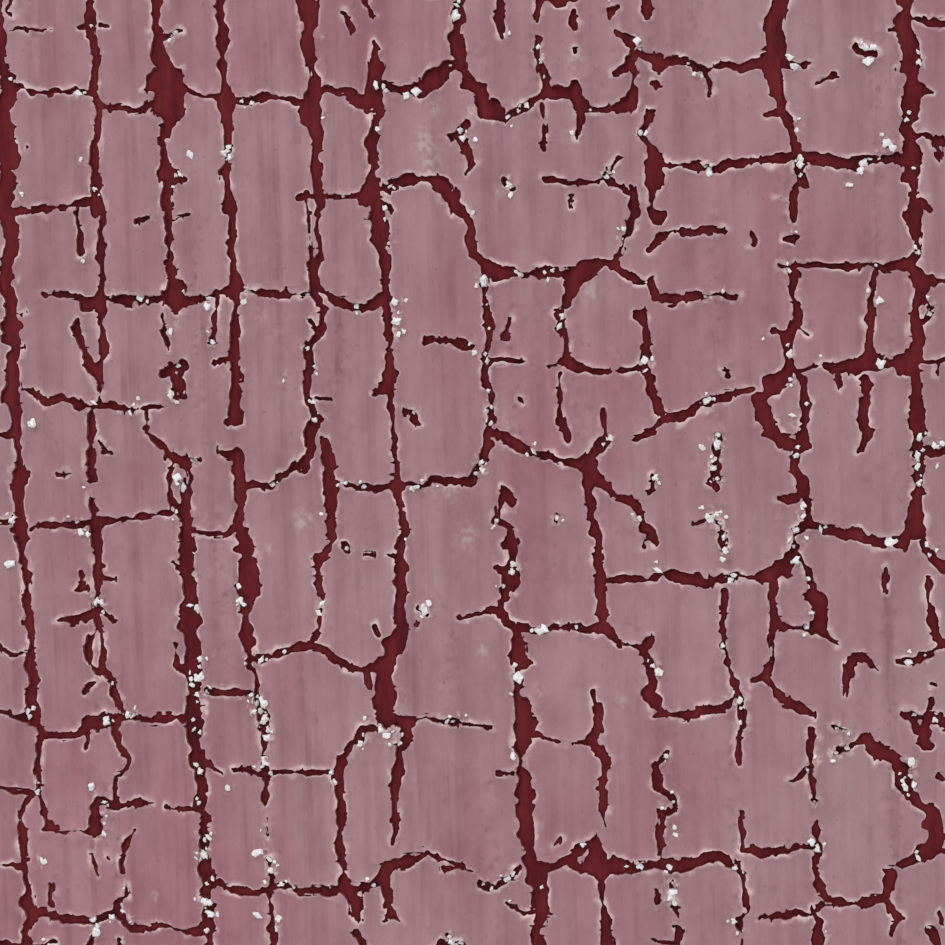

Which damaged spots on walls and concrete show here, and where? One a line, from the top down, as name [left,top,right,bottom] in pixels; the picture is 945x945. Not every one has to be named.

peeling [341,11,356,36]
peeling [569,9,579,31]
peeling [607,0,620,21]
peeling [852,38,878,66]
peeling [815,72,840,85]
peeling [783,230,800,245]
peeling [501,317,512,342]
peeling [403,408,421,426]
crack [0,0,493,945]
crack [319,0,945,945]
peeling [645,473,661,496]
peeling [926,682,937,710]